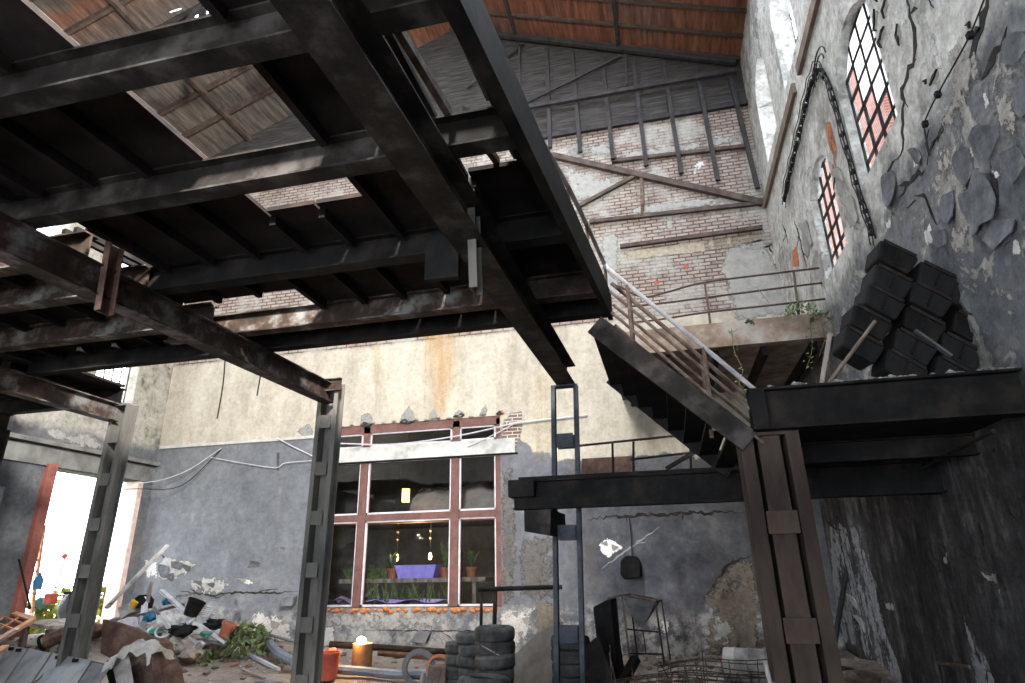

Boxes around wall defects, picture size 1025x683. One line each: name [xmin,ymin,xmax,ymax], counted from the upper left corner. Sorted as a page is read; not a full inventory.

peeling [872,0,901,48]
crack [887,0,1008,225]
peeling [907,148,922,167]
peeling [922,45,1025,255]
peeling [881,170,898,228]
peeling [158,557,260,594]
peeling [612,560,768,683]
water stain [965,622,1005,683]